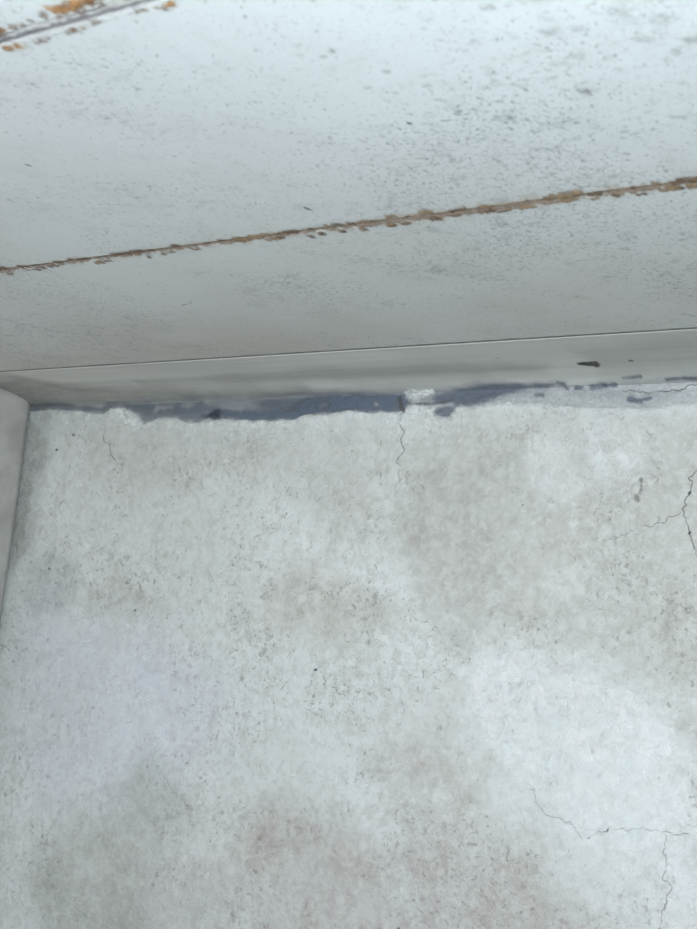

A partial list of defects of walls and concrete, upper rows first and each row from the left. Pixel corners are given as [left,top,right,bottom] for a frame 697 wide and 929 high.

corrosion [40,0,106,20]
corrosion [0,177,697,275]
peeling [209,416,303,427]
crack [647,829,688,928]